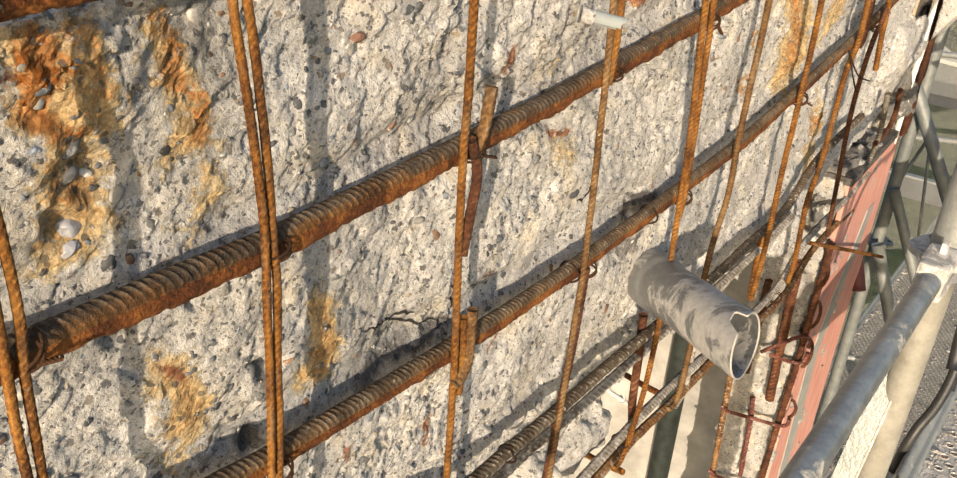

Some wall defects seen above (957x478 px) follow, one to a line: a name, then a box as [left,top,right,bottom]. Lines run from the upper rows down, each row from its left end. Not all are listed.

spalling [283,40,373,110]
spalling [403,1,450,46]
rust [768,0,846,99]
spalling [60,136,103,187]
rust [0,5,229,284]
rust [802,85,824,174]
spalling [97,254,117,278]
rust [291,281,346,395]
crack [362,285,453,332]
spalling [55,371,100,469]
rust [140,341,215,478]
spalling [335,430,428,478]